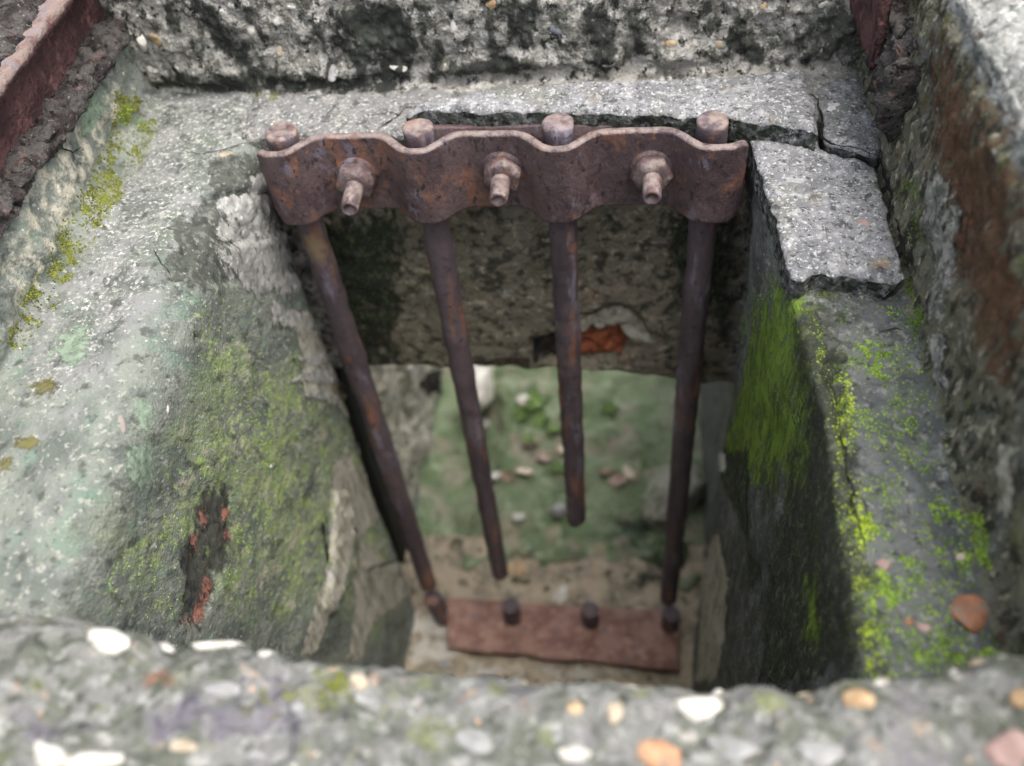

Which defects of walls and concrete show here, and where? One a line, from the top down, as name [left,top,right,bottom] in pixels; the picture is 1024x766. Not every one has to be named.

rust [0,0,46,66]
crack [809,93,910,272]
spalling [177,484,232,632]
water stain [721,446,748,536]
water stain [746,290,890,689]
crack [833,389,869,558]